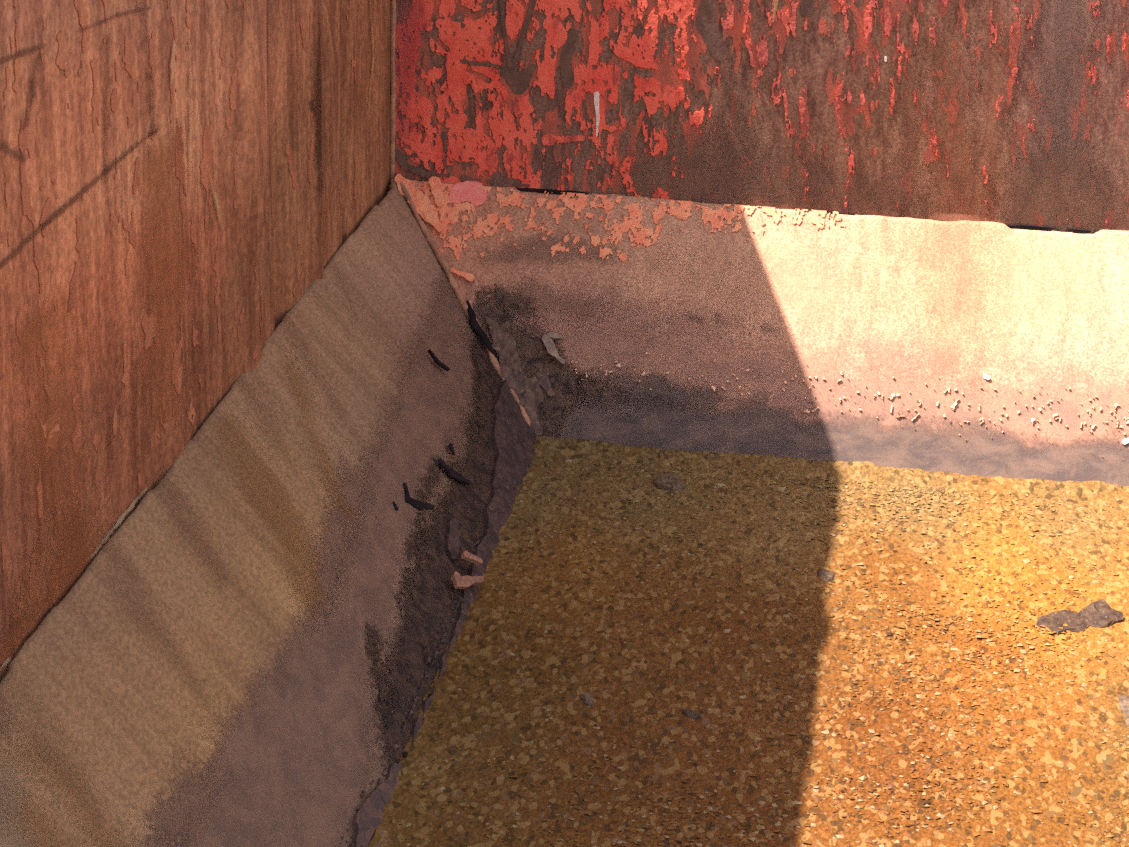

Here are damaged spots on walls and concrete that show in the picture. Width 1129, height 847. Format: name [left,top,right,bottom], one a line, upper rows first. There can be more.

peeling [0,96,56,294]
peeling [28,215,99,468]
peeling [40,0,244,439]
peeling [386,0,949,282]
damp [479,283,1129,486]
peeling [989,0,1034,48]
peeling [1089,33,1126,94]
damp [147,275,477,847]